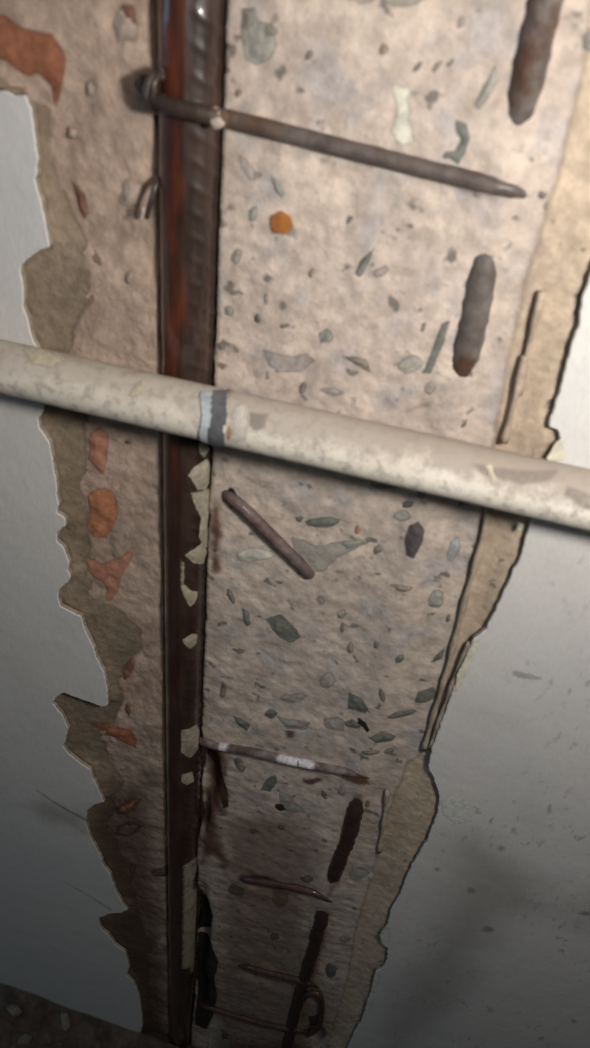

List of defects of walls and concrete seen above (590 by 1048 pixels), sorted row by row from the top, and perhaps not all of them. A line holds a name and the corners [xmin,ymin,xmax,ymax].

spalling [0,0,590,461]
rust [212,507,222,572]
rust [202,749,229,862]
spalling [41,405,531,1048]
rust [341,773,369,784]